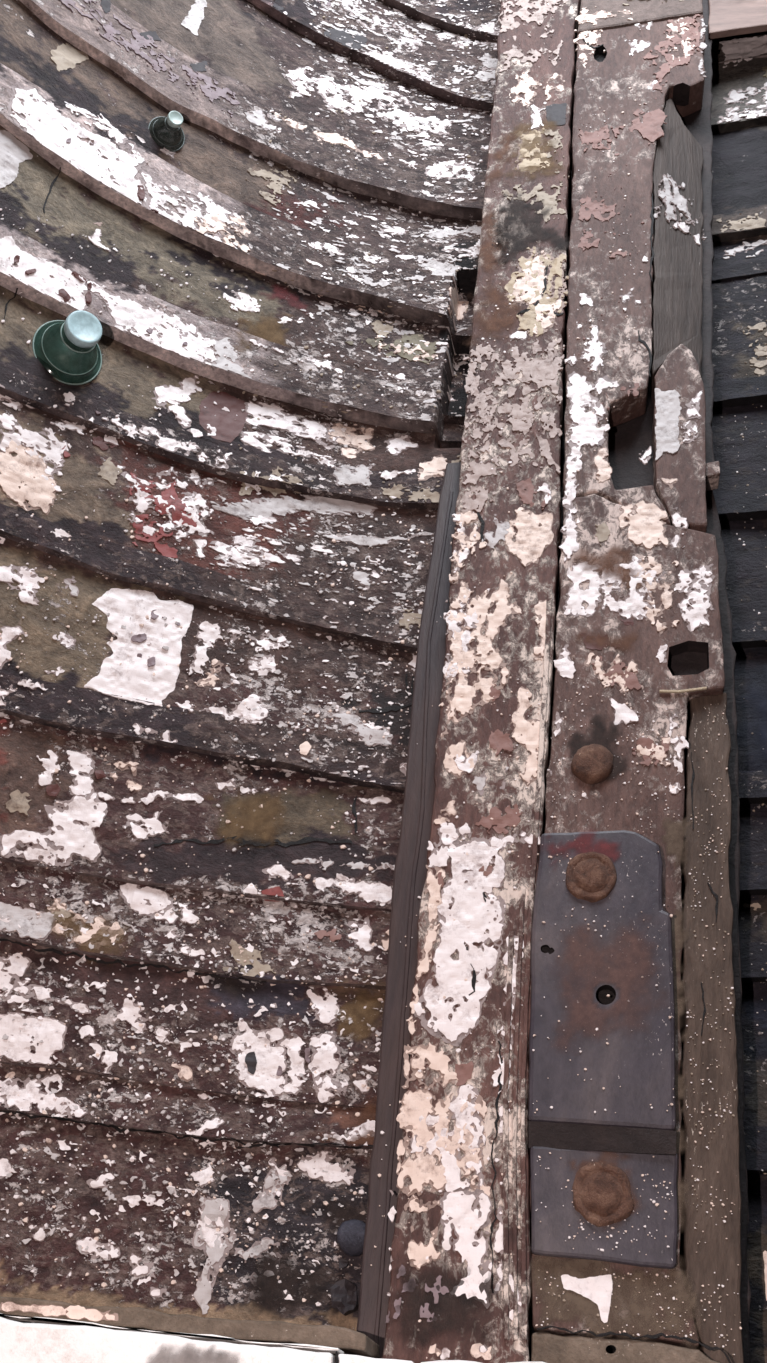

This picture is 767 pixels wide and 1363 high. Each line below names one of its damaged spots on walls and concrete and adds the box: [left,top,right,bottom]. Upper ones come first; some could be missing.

peeling [50,43,89,72]
peeling [60,0,767,262]
peeling [0,86,251,265]
peeling [0,150,715,805]
rust [571,715,626,780]
peeling [0,736,395,1314]
peeling [386,686,564,1323]
peeling [0,1302,119,1321]
peeling [561,1274,613,1323]
peeling [426,1344,451,1360]
peeling [470,1343,492,1360]
crack [537,1326,731,1363]